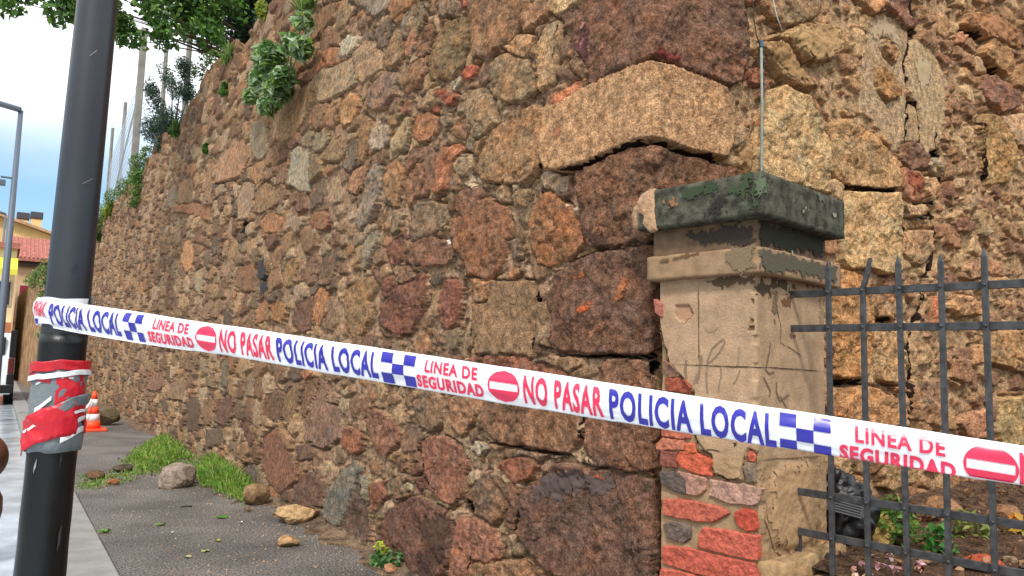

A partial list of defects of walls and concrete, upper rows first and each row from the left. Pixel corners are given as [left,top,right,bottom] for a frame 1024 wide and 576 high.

crack [902,0,938,147]
crack [538,139,716,196]
spalling [641,328,694,396]
spalling [661,434,769,576]